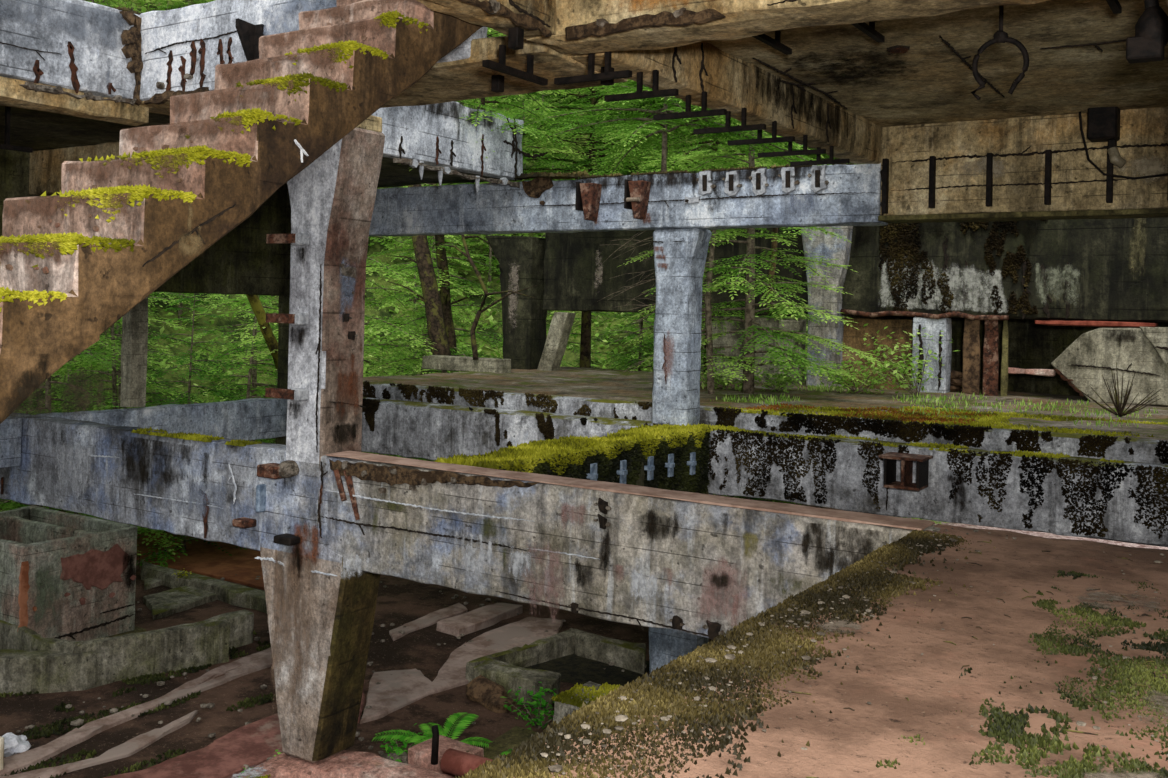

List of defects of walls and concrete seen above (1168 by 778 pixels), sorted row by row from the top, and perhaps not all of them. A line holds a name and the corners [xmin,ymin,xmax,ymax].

spalling [460,0,726,40]
peeling [4,0,402,231]
spalling [393,158,554,205]
peeling [0,242,61,274]
leakage [854,222,974,253]
leakage [987,220,1079,302]
leakage [881,261,1007,313]
leakage [948,474,966,508]
peeling [60,544,136,605]